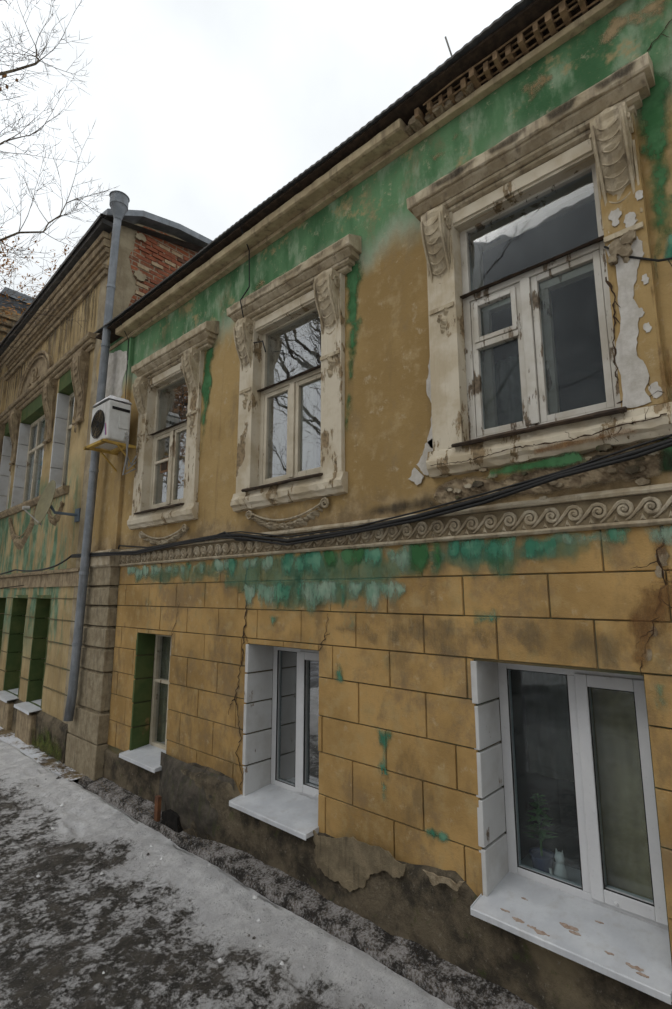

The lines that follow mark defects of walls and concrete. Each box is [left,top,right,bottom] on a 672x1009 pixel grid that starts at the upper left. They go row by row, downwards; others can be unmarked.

peeling [603,0,665,42]
spalling [129,227,198,306]
peeling [606,72,672,408]
peeling [409,359,433,485]
spalling [434,437,672,506]
peeling [127,528,626,608]
crack [630,526,672,675]
peeling [379,730,391,789]